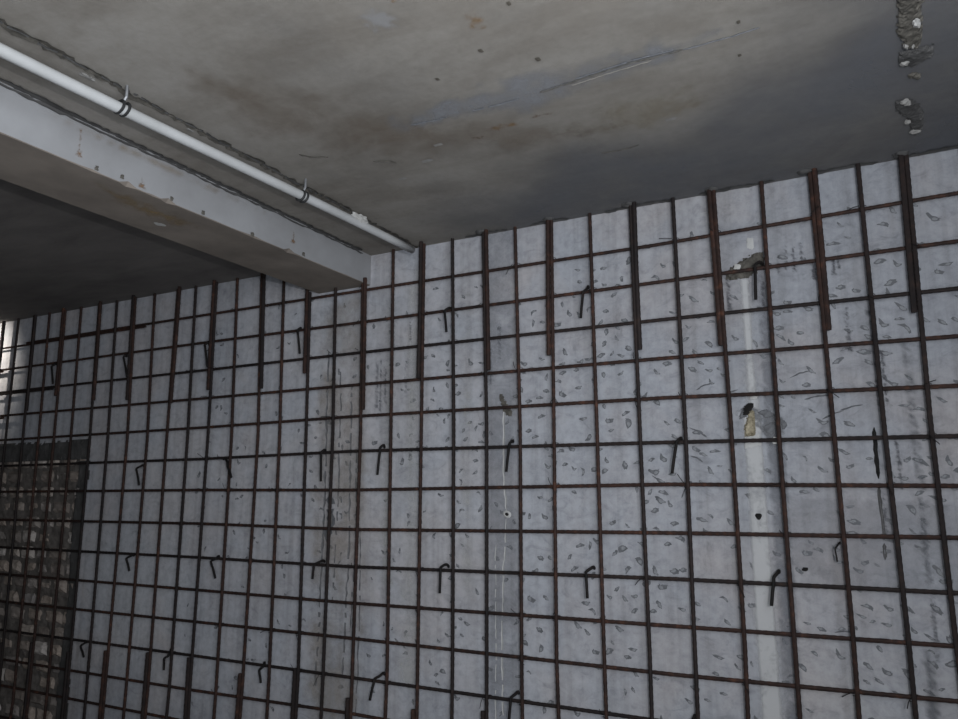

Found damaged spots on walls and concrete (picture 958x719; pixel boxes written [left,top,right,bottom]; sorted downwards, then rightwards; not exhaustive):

spalling [896,0,934,80]
spalling [895,97,924,135]